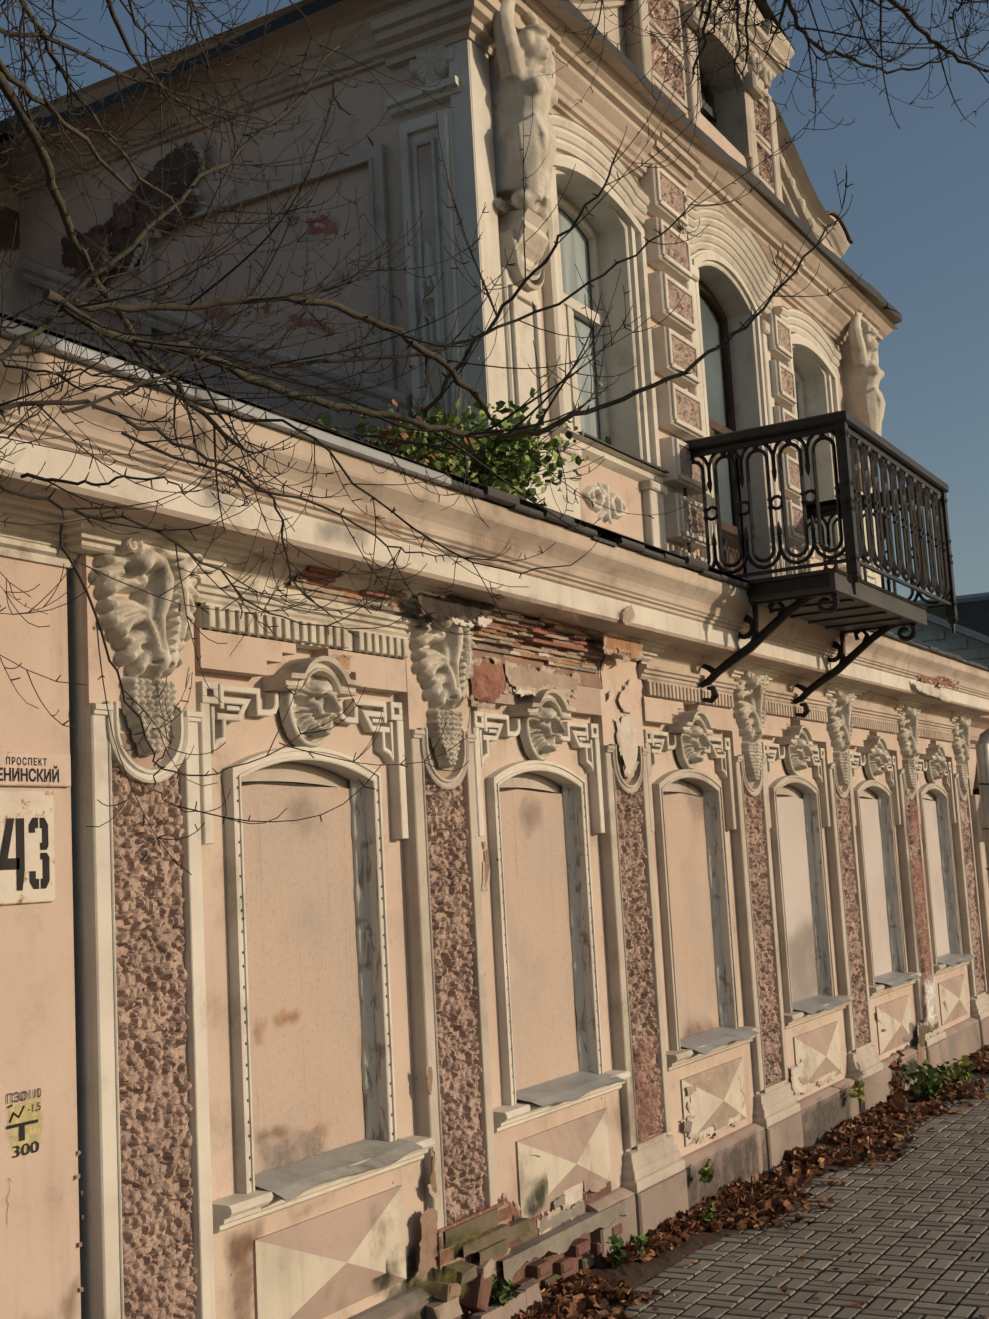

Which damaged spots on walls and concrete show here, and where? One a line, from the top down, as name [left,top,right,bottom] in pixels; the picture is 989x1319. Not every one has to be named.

spalling [0,205,20,252]
spalling [56,139,206,288]
spalling [286,565,643,711]
peeling [609,679,642,778]
spalling [497,1176,629,1290]